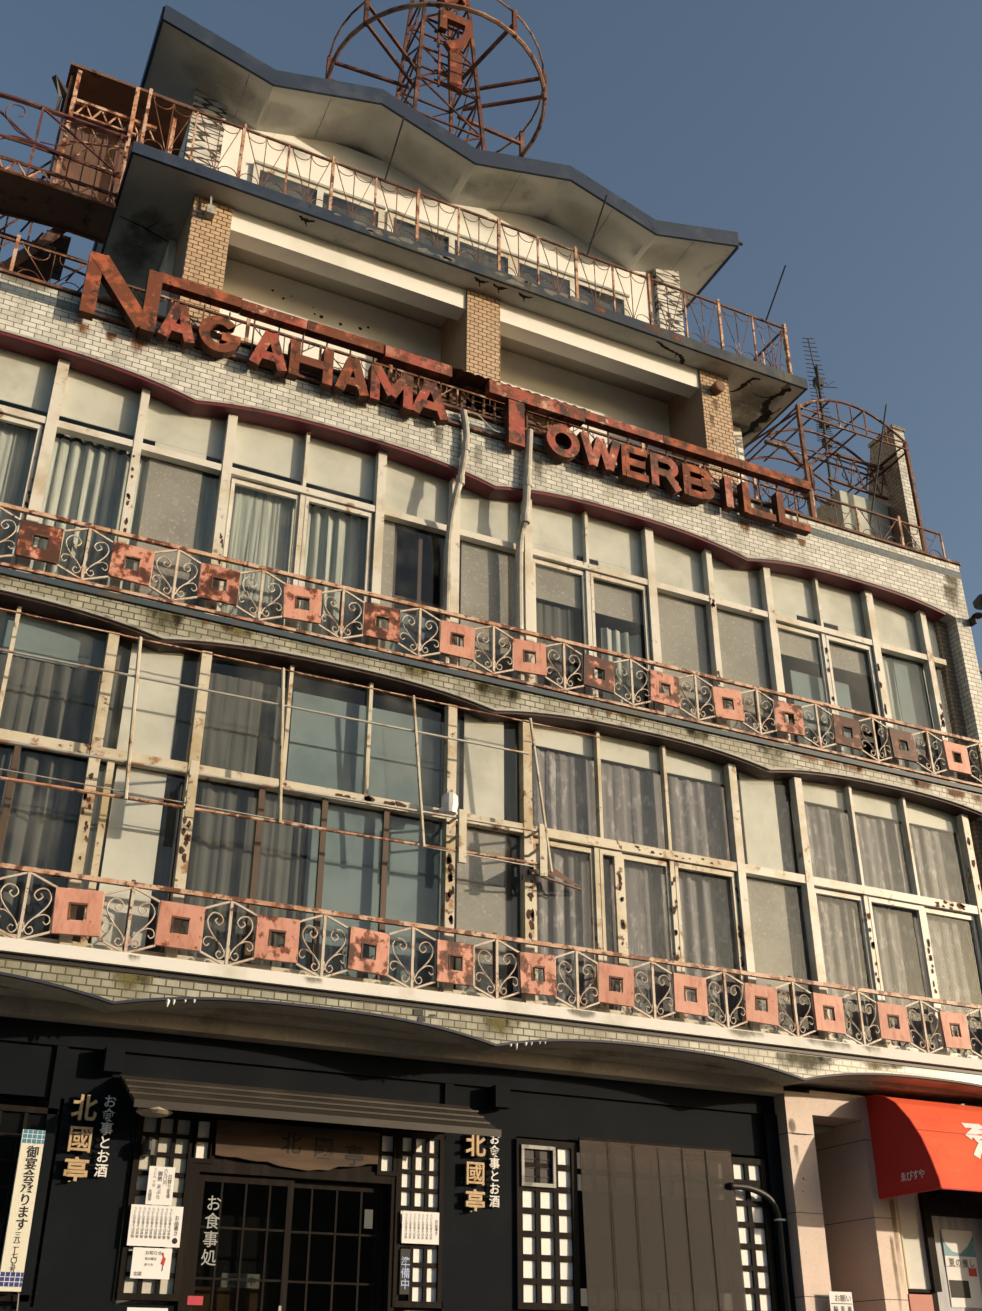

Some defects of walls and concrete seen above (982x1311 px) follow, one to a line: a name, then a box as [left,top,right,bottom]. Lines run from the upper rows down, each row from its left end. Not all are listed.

crack [729,378,792,437]
corrosion [803,755,862,772]
peeling [446,853,454,925]
peeling [526,892,535,939]
peeling [935,900,982,912]